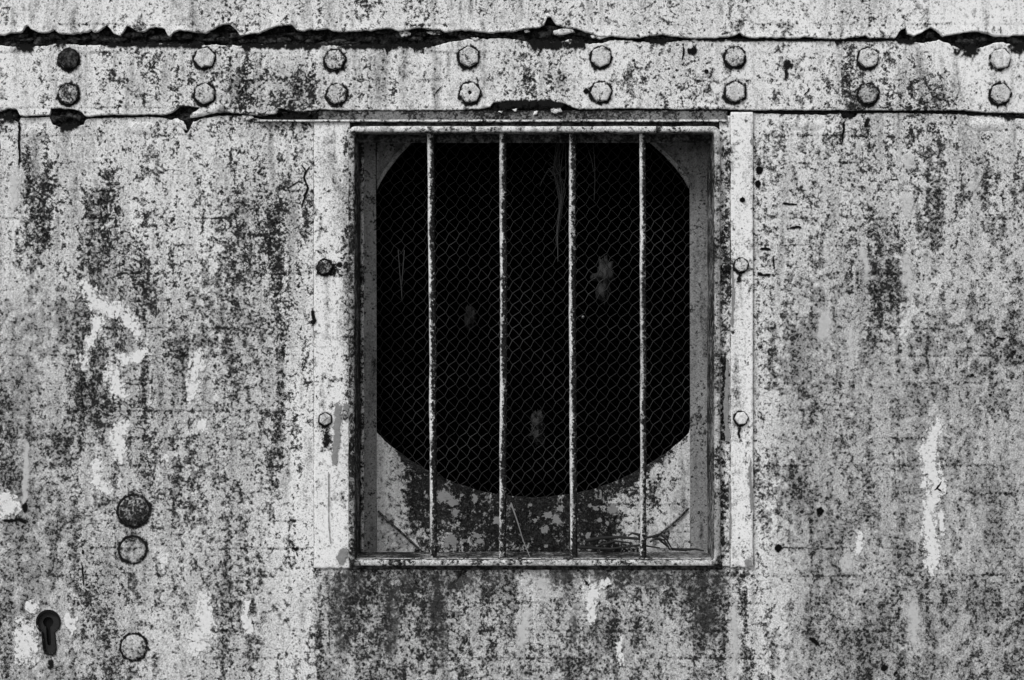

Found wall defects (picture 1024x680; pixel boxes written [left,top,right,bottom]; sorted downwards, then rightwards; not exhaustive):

crack [0,25,613,54]
crack [642,27,1024,60]
crack [1,103,319,166]
leakage [67,189,153,415]
leakage [174,333,206,405]
leakage [1,443,30,504]
leakage [88,418,130,496]
leakage [918,417,947,576]
leakage [183,589,218,659]
leakage [240,595,255,635]
leakage [311,557,504,678]
leakage [536,566,740,677]